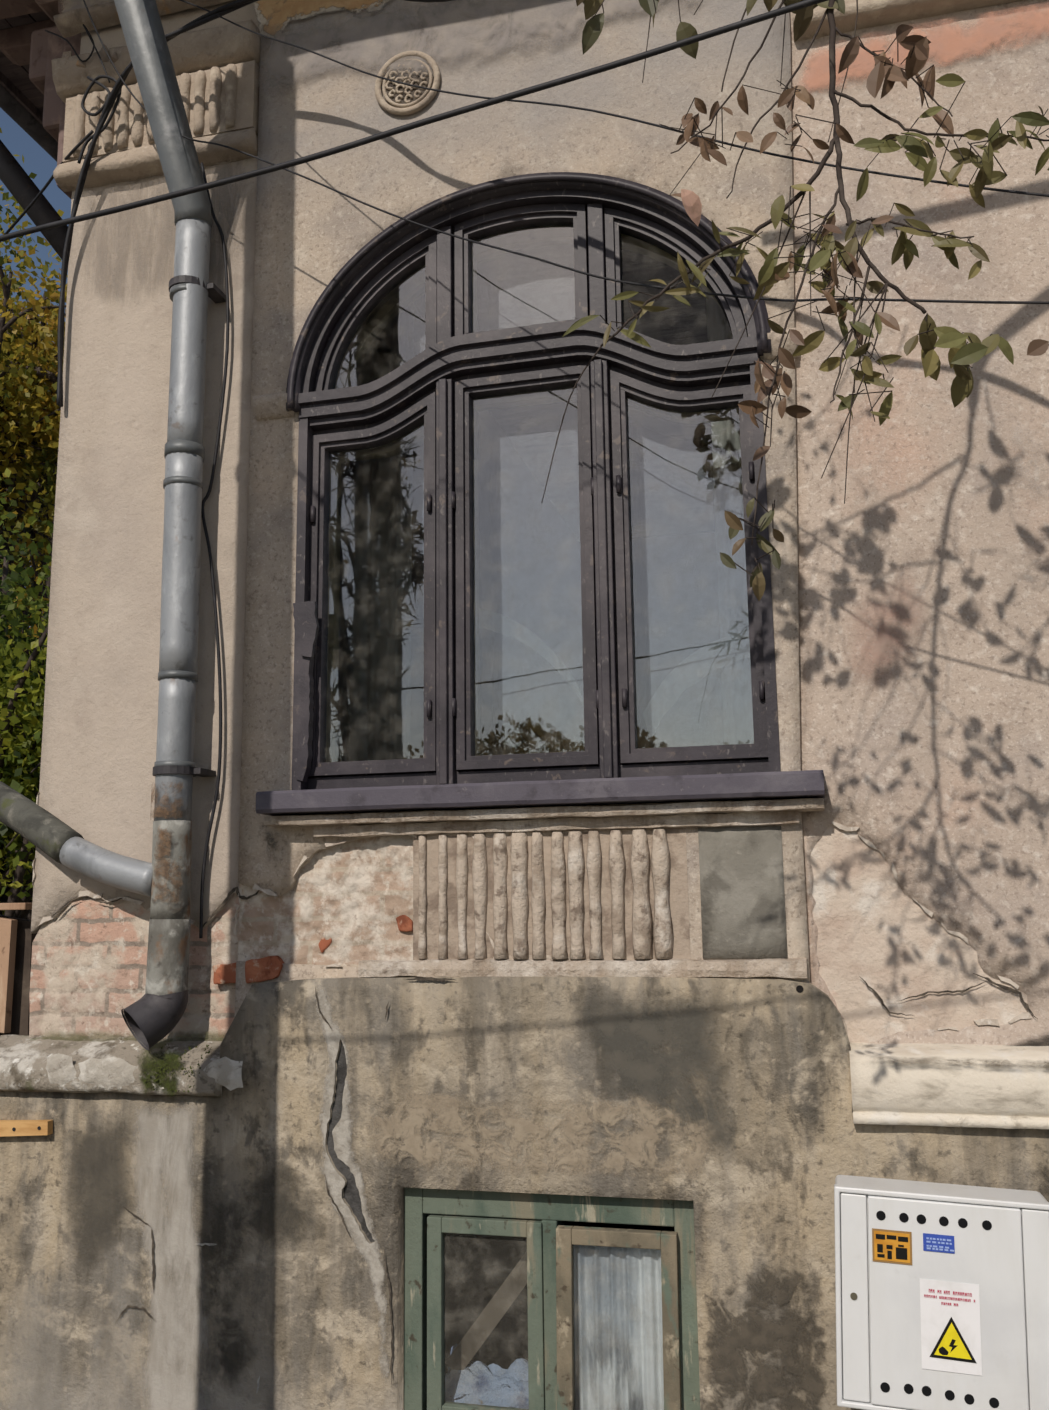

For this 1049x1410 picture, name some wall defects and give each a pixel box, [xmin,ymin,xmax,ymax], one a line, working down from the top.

peeling [254,0,389,38]
rust [150,784,183,902]
flaking render [29,890,150,1090]
flaking render [164,835,417,1039]
crack [385,977,455,1019]
flaking render [809,821,1032,1043]
crack [859,973,1038,1019]
flaking render [203,1056,243,1091]
crack [315,987,393,1385]
leakage [69,1109,311,1410]
leakage [701,1269,825,1410]